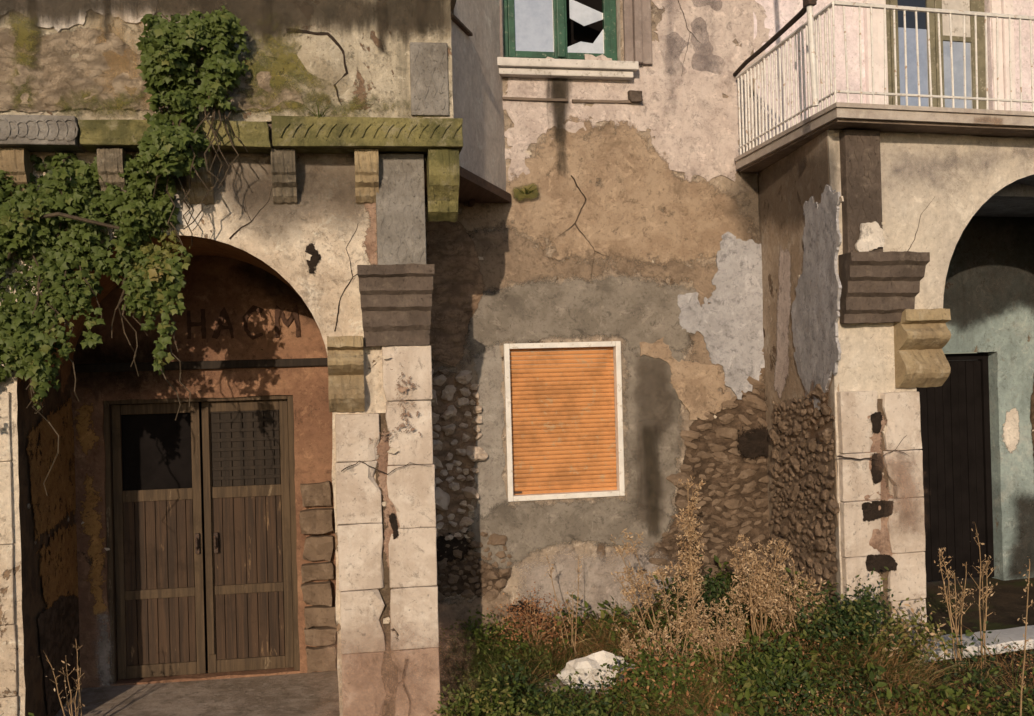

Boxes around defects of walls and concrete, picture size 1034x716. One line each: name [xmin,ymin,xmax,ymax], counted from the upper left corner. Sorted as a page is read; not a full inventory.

crack [286,28,348,105]
water stain [548,78,568,170]
spalling [362,203,377,265]
crack [558,175,609,275]
peeling [369,115,757,657]
peeling [1002,378,1034,457]
peeling [26,397,111,715]
flaking render [639,331,840,611]
spalling [862,411,915,573]
peeling [1009,497,1034,579]